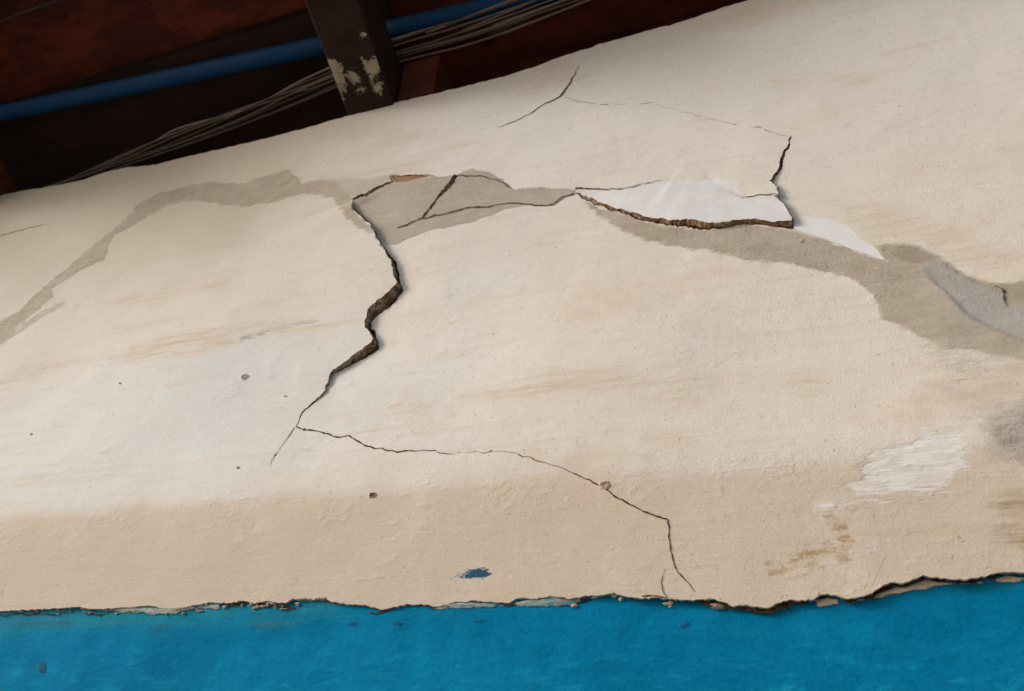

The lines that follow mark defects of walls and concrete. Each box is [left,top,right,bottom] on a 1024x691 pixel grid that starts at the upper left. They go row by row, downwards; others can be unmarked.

peeling [328,56,384,102]
peeling [0,136,1024,353]
crack [271,173,1024,614]
leakage [862,291,1024,573]
spalling [279,589,337,603]